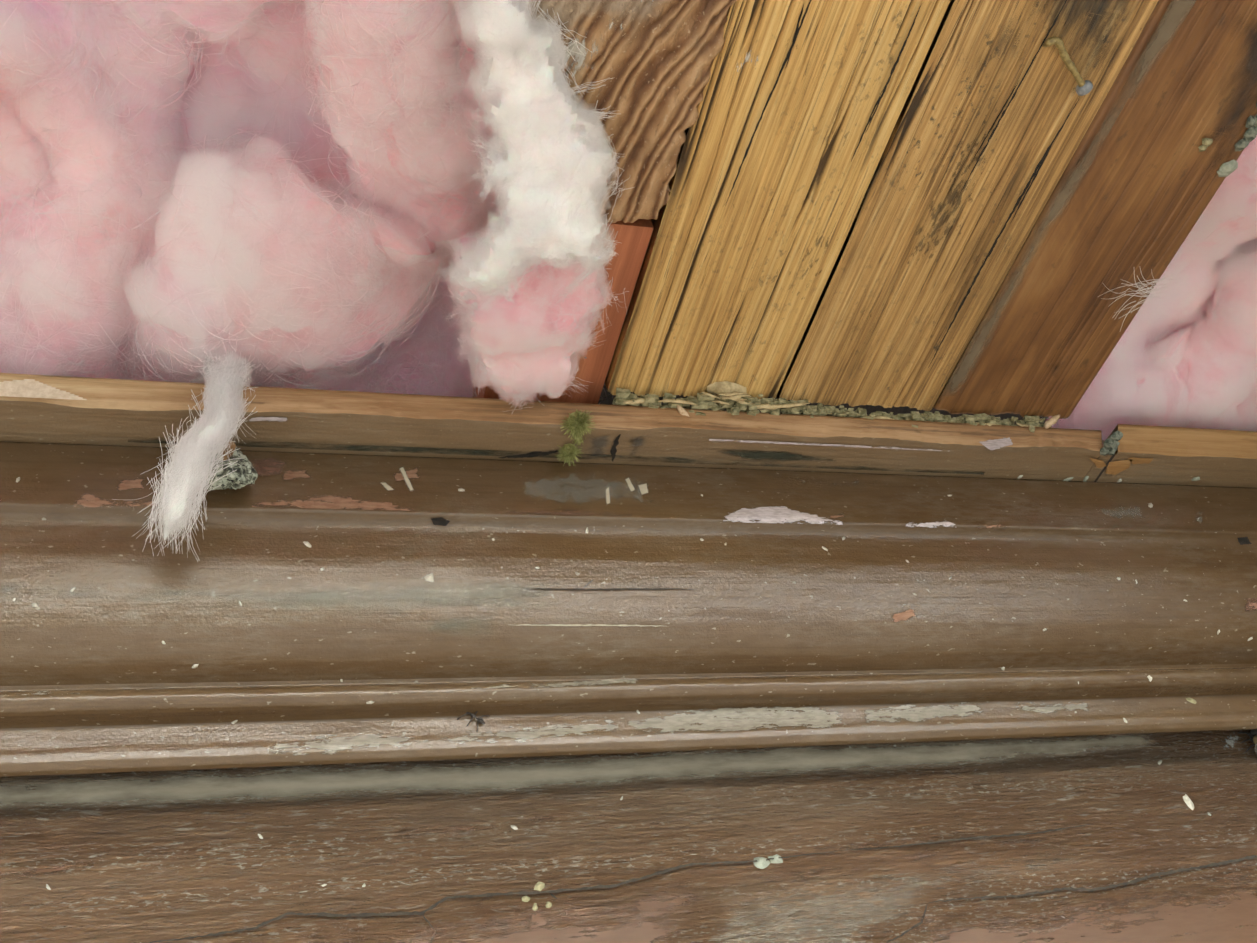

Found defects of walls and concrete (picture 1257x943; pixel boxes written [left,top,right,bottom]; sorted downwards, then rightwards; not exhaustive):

peeling [74,478,158,507]
peeling [252,495,413,511]
peeling [532,679,637,688]
peeling [864,702,981,723]
peeling [1018,702,1089,713]
peeling [268,706,841,755]
crack [149,824,1090,943]
crack [887,855,1257,943]